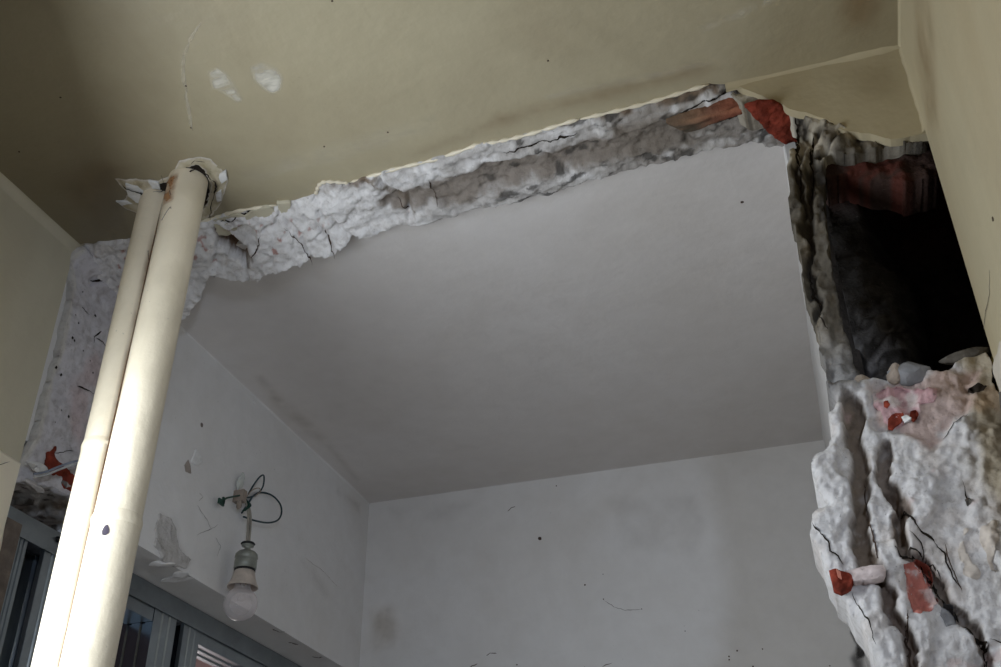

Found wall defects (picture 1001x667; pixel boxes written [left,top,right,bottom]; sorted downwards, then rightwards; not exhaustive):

spalling [116,157,291,236]
spalling [731,92,938,383]
flaking render [10,246,117,531]
flaking render [872,386,937,431]
spalling [148,513,193,584]
crack [812,523,843,564]
crack [852,593,876,644]
flaking render [904,559,938,614]
crack [864,485,1001,667]
peeling [958,520,999,580]